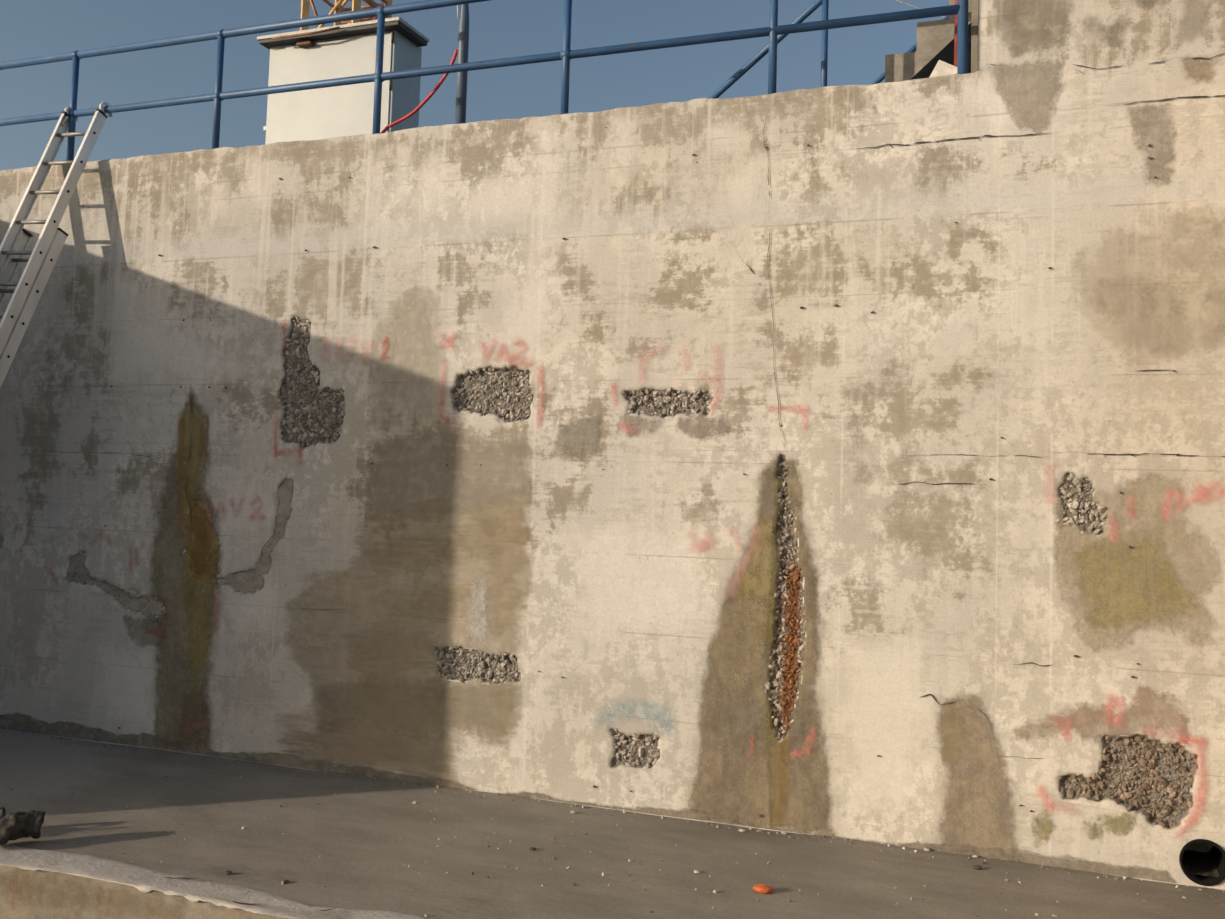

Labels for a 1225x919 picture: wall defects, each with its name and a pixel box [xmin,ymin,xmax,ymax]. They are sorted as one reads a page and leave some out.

spalling [277,317,345,446]
spalling [451,367,533,422]
spalling [621,387,712,418]
spalling [1056,473,1107,535]
leakage [0,394,475,790]
leakage [469,584,487,642]
leakage [1055,474,1217,651]
spalling [437,646,521,684]
leakage [506,461,1189,883]
spalling [613,729,660,768]
spalling [1058,735,1198,828]